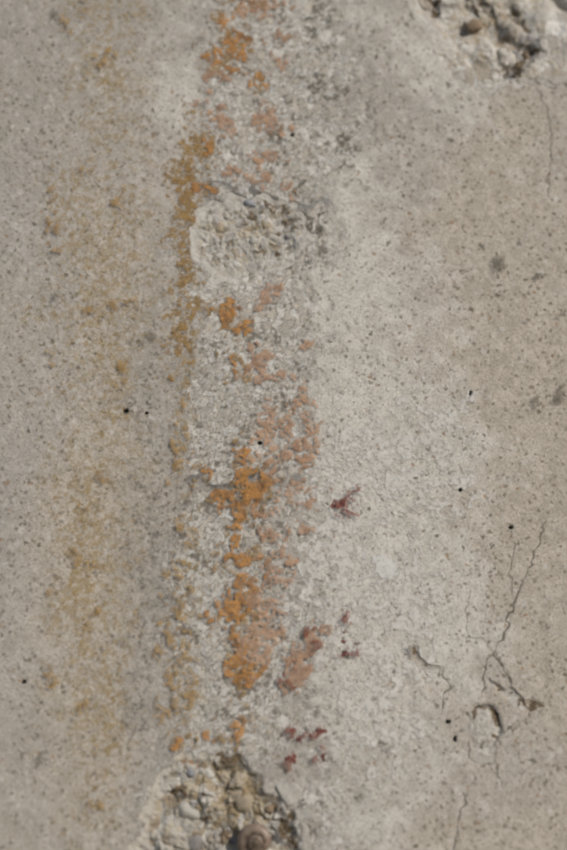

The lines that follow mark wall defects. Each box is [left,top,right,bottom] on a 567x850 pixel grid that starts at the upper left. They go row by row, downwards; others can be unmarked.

rust [153,0,332,753]
spalling [128,0,382,850]
spalling [403,0,567,100]
crack [482,586,521,698]